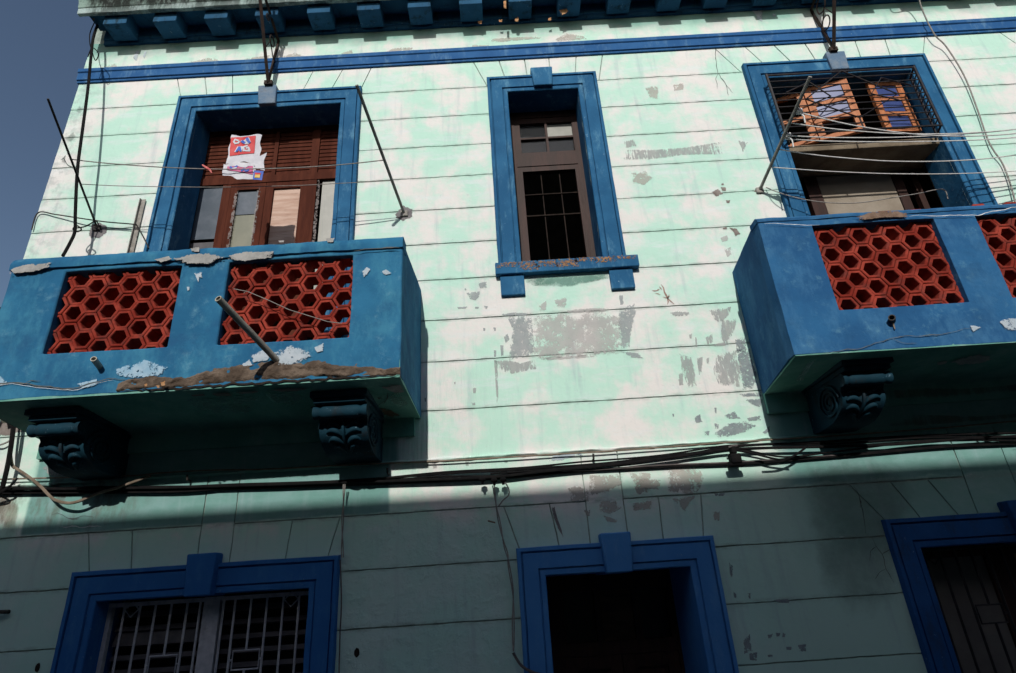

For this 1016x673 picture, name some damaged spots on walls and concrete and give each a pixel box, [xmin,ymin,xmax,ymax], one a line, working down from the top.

peeling [624,140,719,160]
peeling [633,172,651,184]
flaking render [10,262,50,274]
spalling [116,343,401,396]
peeling [483,295,642,397]
peeling [679,307,770,437]
peeling [568,467,702,522]